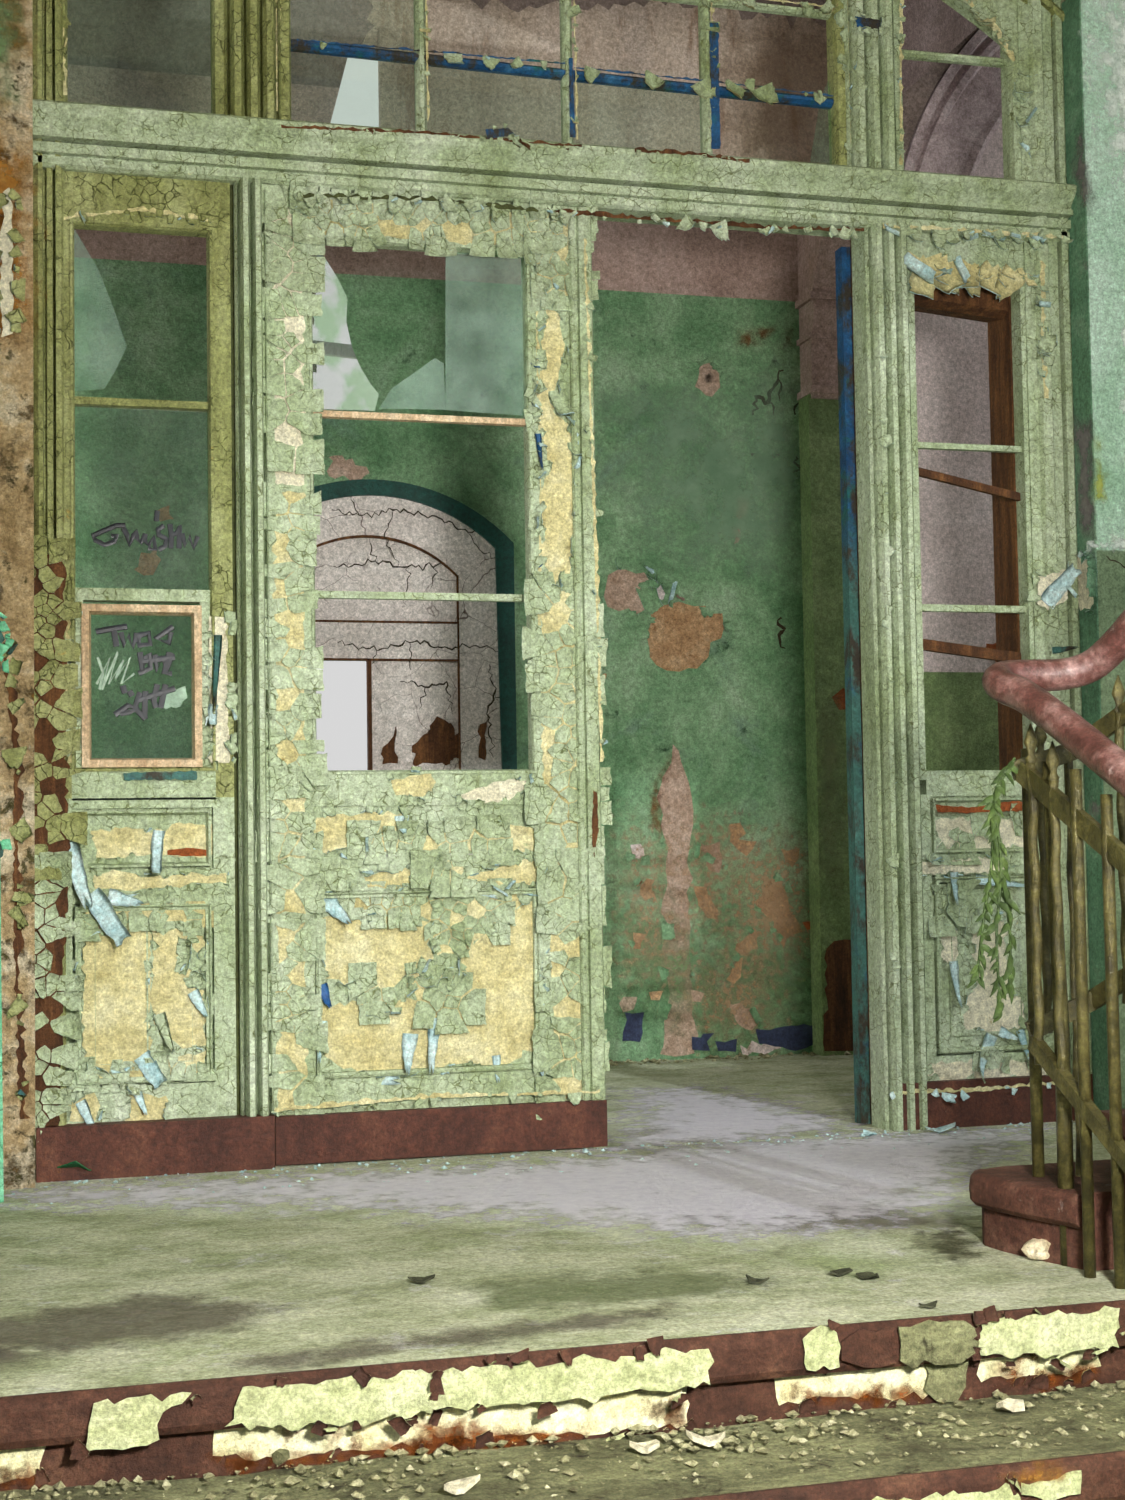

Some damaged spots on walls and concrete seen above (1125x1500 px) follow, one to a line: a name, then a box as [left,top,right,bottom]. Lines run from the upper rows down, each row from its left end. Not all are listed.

rust [0,156,28,329]
crack [332,500,500,757]
peeling [252,174,864,1120]
peeling [0,535,238,1139]
peeling [889,803,1055,1103]
peeling [69,1392,202,1460]
rust [225,1454,255,1472]
rust [287,1421,582,1464]
peeling [213,1335,714,1463]
rust [656,1401,684,1424]
peeling [774,1305,1125,1414]
peeling [872,1470,1082,1500]